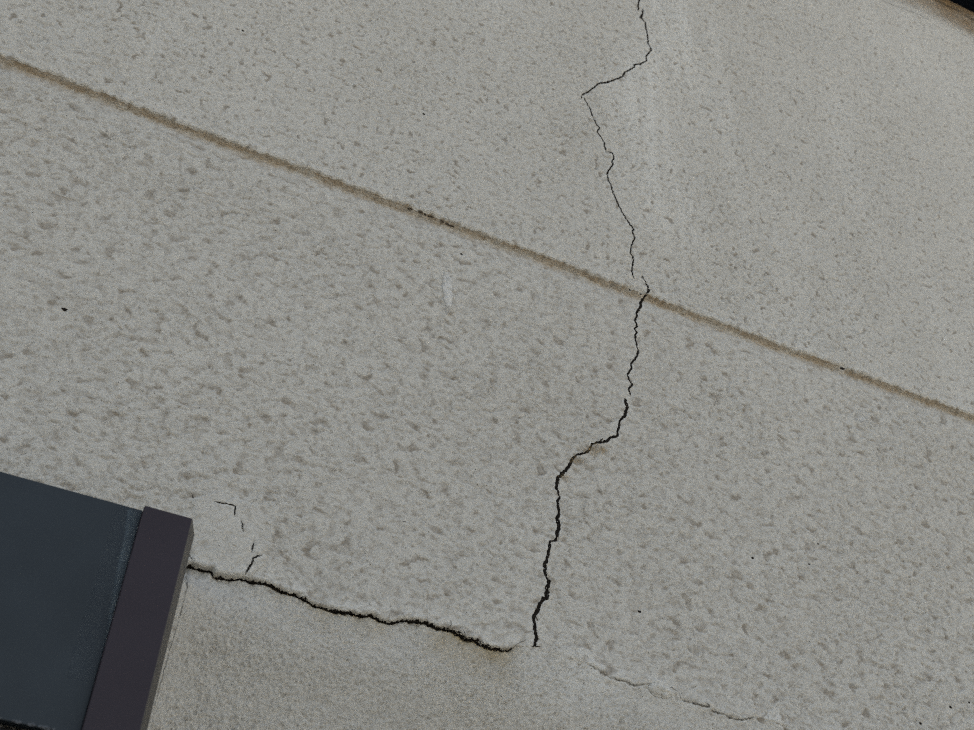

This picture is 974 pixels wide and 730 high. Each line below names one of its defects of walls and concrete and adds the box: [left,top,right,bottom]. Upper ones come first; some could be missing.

crack [158,0,652,694]